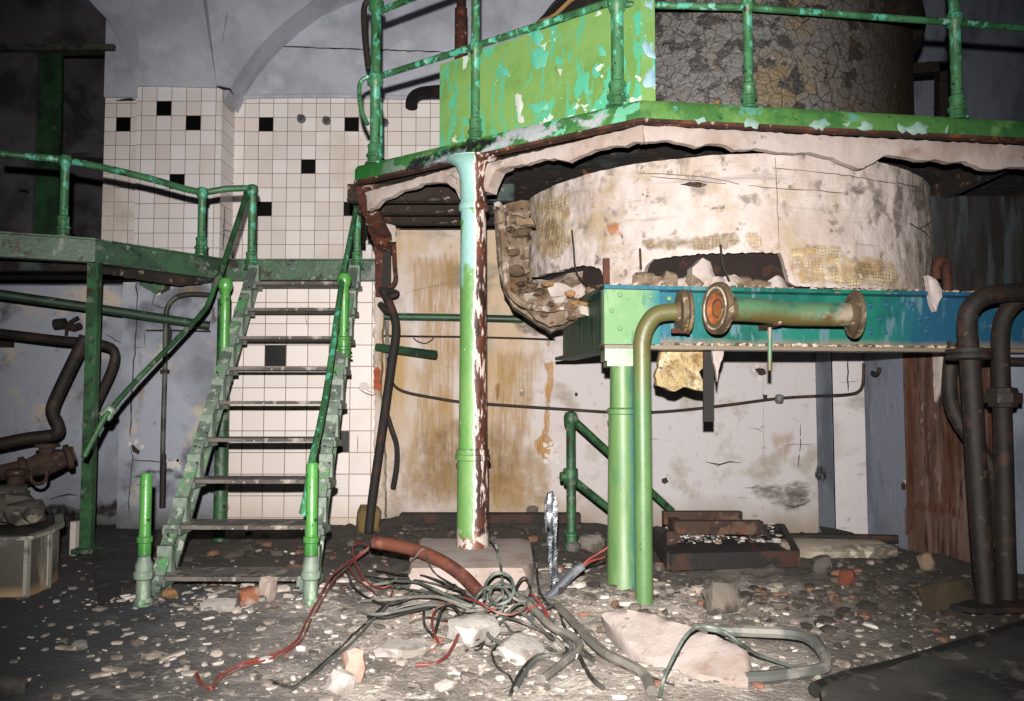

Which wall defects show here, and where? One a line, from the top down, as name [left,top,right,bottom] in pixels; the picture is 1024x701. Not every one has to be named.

peeling [527,29,562,76]
peeling [642,38,656,88]
peeling [515,93,549,123]
spalling [495,117,1024,172]
spalling [365,167,460,212]
crack [104,283,164,510]
crack [707,376,809,488]
water stain [759,483,805,508]